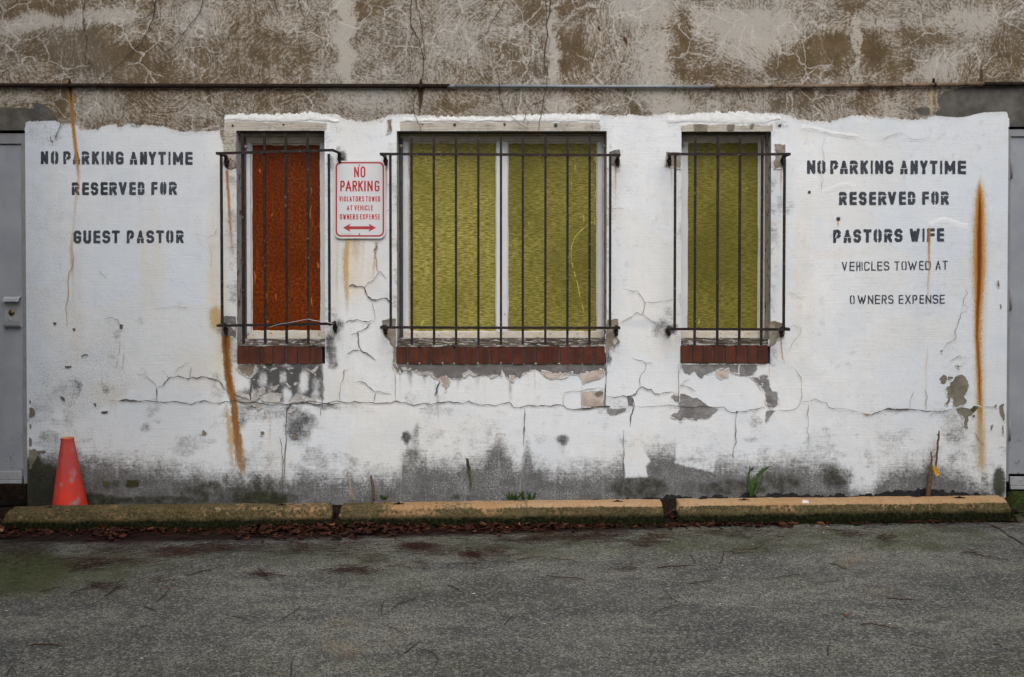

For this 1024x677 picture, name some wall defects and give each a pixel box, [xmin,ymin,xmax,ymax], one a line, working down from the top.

corrosion [67,82,79,175]
corrosion [210,307,245,471]
peeling [236,364,318,413]
spalling [381,318,633,415]
crack [106,184,951,495]
spalling [670,393,718,422]
spalling [681,363,780,422]
spalling [939,365,981,430]
corrosion [973,184,986,465]
damp [643,487,981,500]